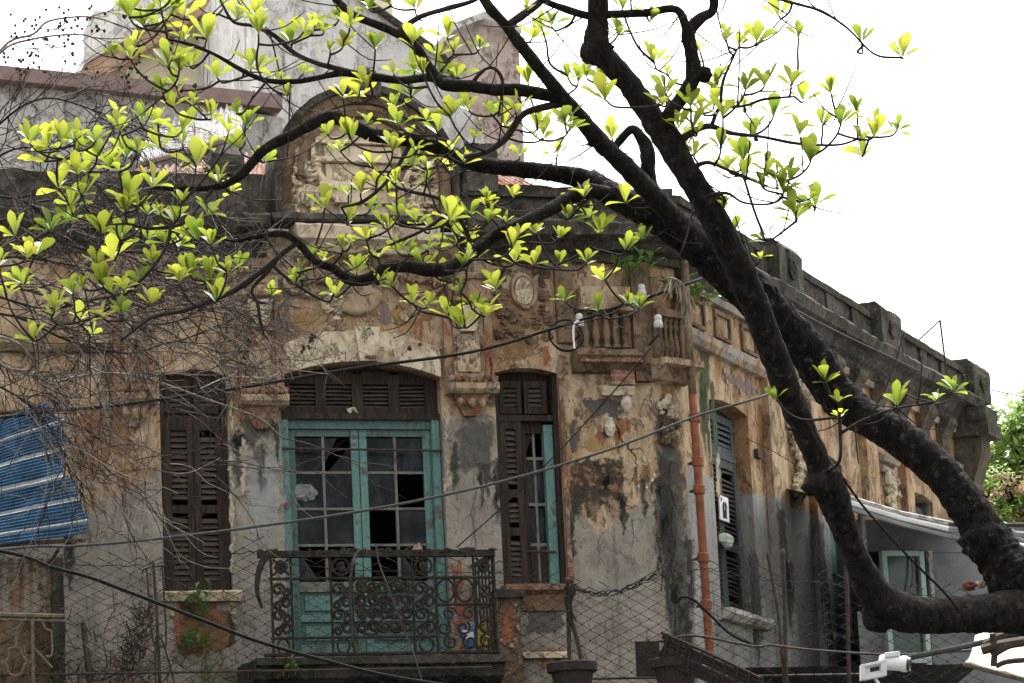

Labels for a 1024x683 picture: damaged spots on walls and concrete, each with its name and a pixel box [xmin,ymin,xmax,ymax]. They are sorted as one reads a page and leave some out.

leakage [443,396,503,517]
leakage [653,410,696,655]
flaking render [499,602,521,648]